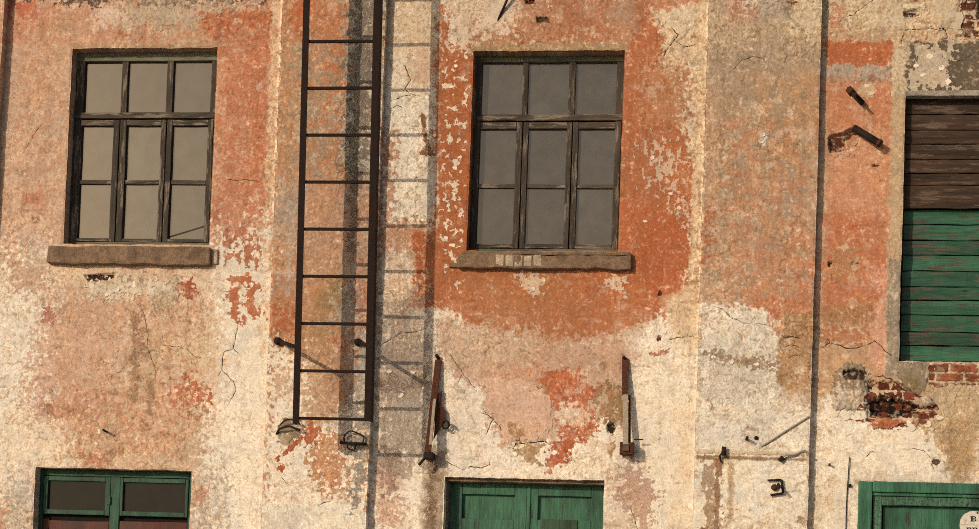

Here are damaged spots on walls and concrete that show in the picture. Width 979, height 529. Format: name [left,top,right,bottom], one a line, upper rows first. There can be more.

peeling [13,0,123,9]
peeling [137,0,266,9]
peeling [901,0,979,91]
peeling [414,23,471,273]
peeling [633,128,696,229]
peeling [513,270,546,298]
peeling [603,274,629,299]
crack [118,308,239,403]
peeling [513,366,632,474]
spalling [640,323,672,356]
crack [716,307,906,392]
spalling [830,361,979,431]